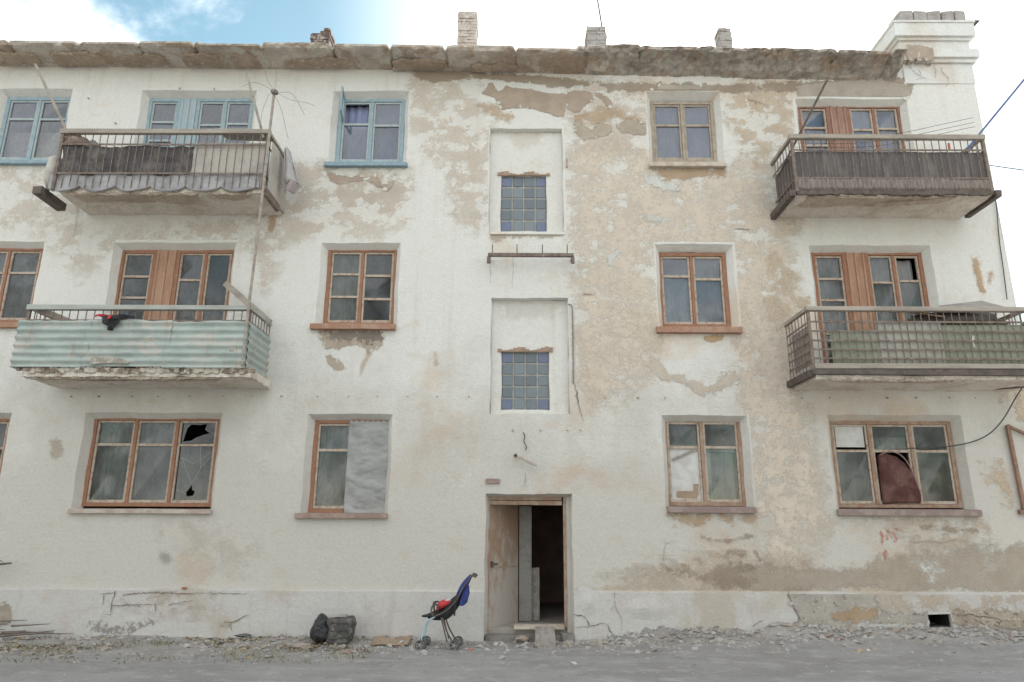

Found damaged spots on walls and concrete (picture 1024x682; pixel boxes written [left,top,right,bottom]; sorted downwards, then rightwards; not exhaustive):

peeling [259,165,405,286]
peeling [391,57,961,574]
peeling [318,330,385,371]
spalling [24,367,257,382]
damp [605,518,1024,592]
crack [102,592,248,630]
crack [573,592,622,636]